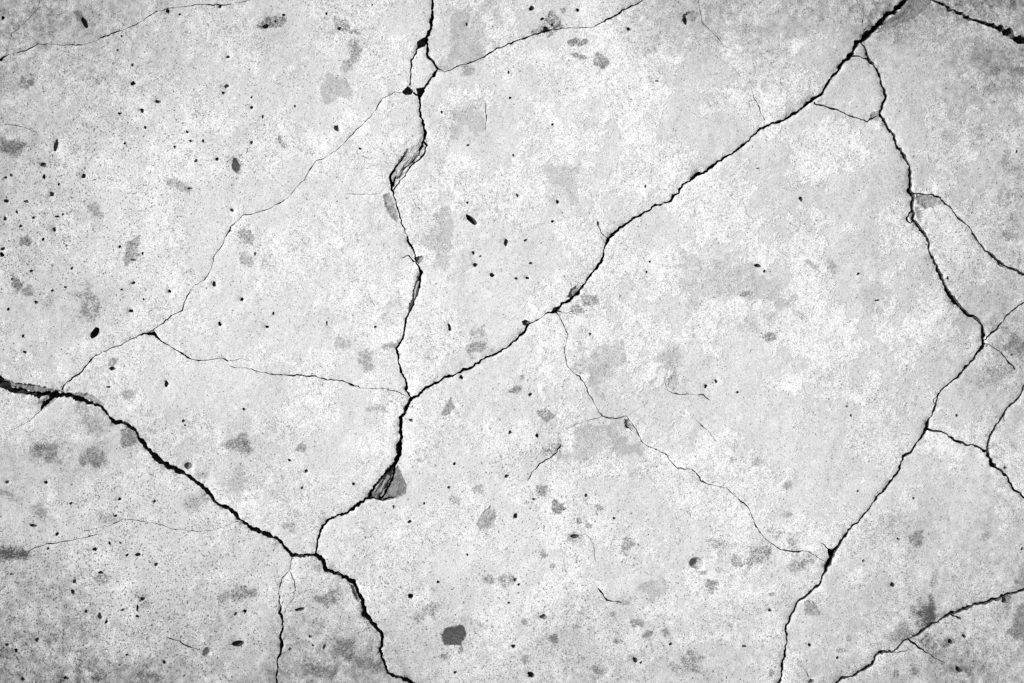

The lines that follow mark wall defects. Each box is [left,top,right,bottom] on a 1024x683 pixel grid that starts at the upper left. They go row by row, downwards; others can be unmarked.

crack [0,0,249,61]
crack [291,92,401,194]
crack [193,198,287,287]
crack [61,290,218,390]
crack [245,367,360,388]
crack [315,0,1024,683]
crack [0,375,415,683]
spalling [371,462,407,509]